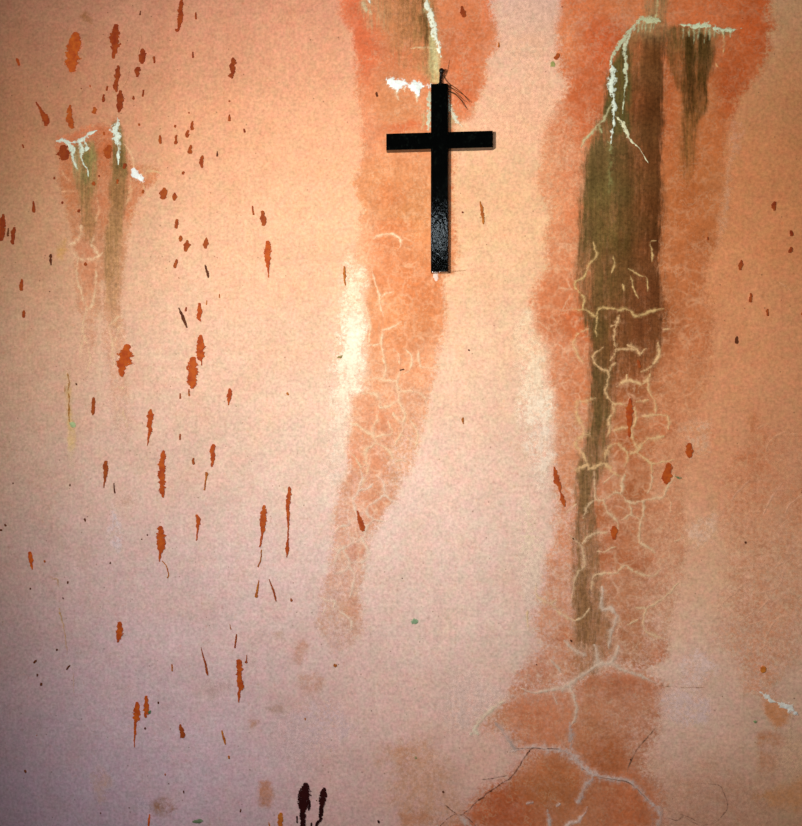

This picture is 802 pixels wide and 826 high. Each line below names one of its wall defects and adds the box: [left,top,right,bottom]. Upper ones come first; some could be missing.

damp [55,118,158,421]
damp [316,0,774,826]
crack [440,243,728,826]
damp [728,416,802,742]